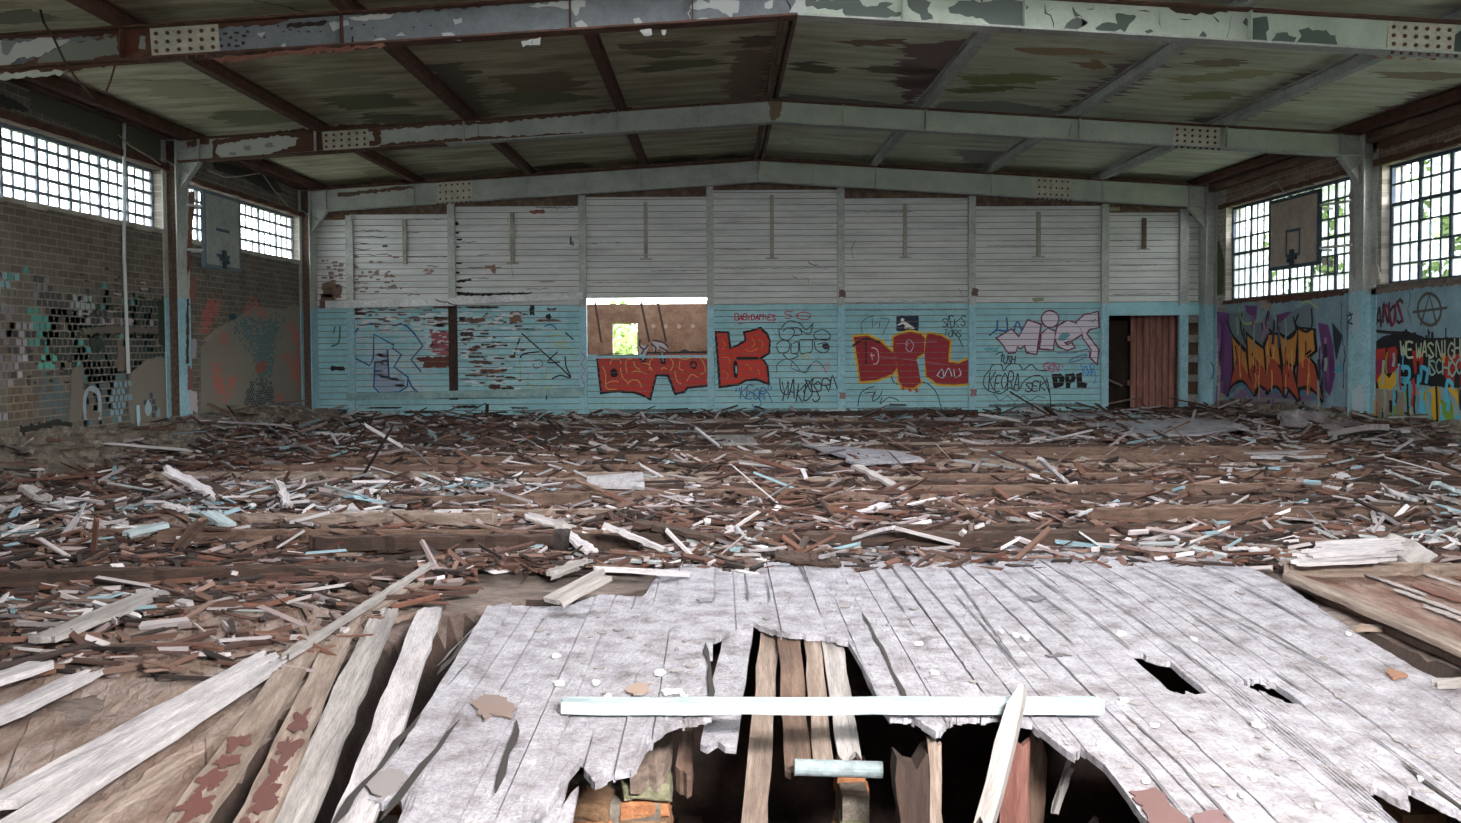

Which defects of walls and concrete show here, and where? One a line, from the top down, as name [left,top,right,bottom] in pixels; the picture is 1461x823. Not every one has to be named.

peeling [329,13,405,41]
peeling [521,0,588,47]
peeling [633,18,667,36]
peeling [690,0,740,19]
peeling [765,0,1029,26]
peeling [1064,8,1153,33]
peeling [1243,16,1337,49]
peeling [319,255,590,392]